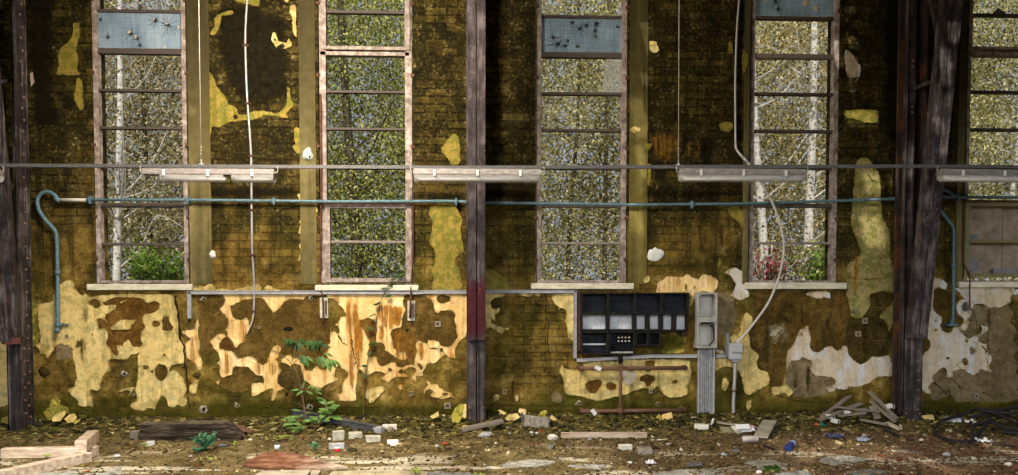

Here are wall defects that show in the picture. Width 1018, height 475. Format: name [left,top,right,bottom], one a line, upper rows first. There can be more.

peeling [210,0,260,35]
peeling [271,0,297,49]
peeling [209,72,294,137]
peeling [0,342,8,407]
peeling [32,203,467,417]
peeling [559,336,692,401]
flaking render [643,157,894,398]
flaking render [922,277,1018,402]